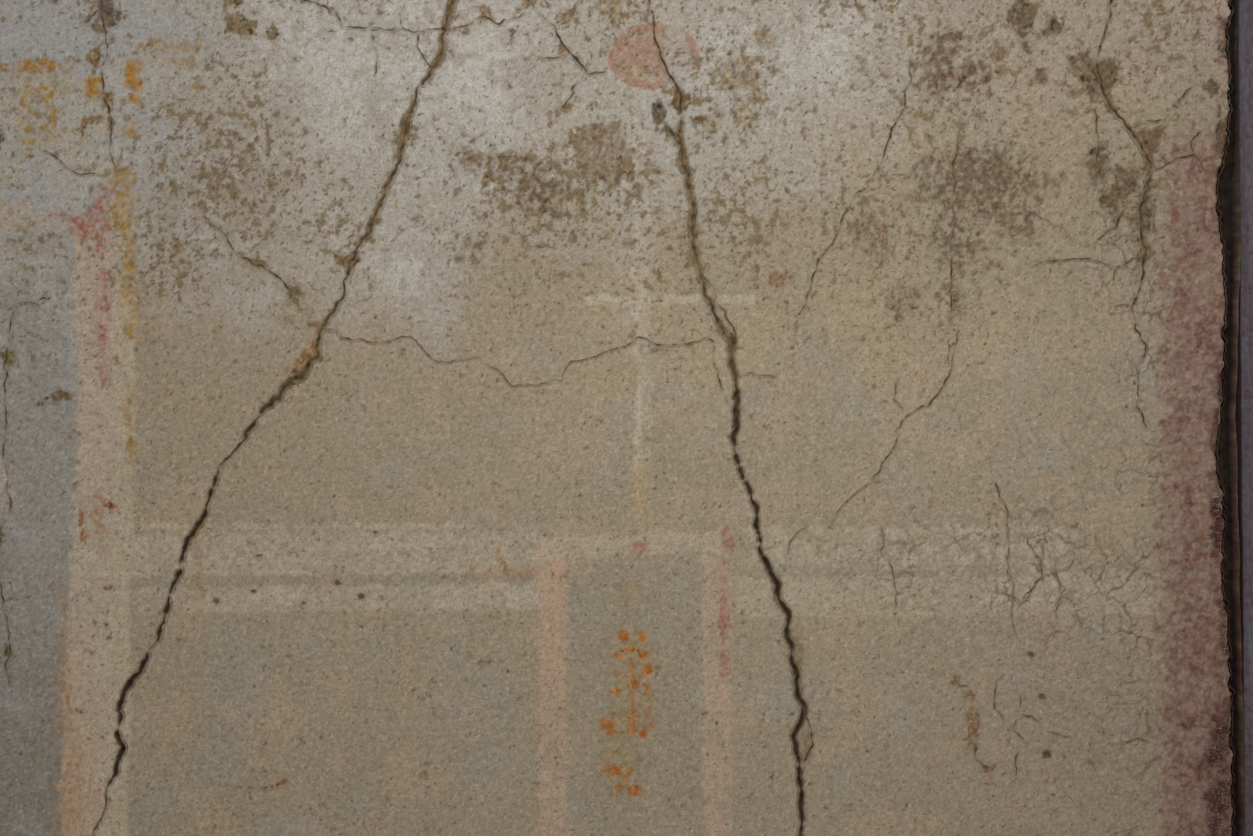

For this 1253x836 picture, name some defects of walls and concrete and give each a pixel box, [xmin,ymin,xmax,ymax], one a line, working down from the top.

crack [41,0,118,178]
crack [0,296,52,688]
crack [92,0,962,836]
crack [951,675,1071,779]
crack [991,478,1062,635]
crack [1021,0,1244,836]